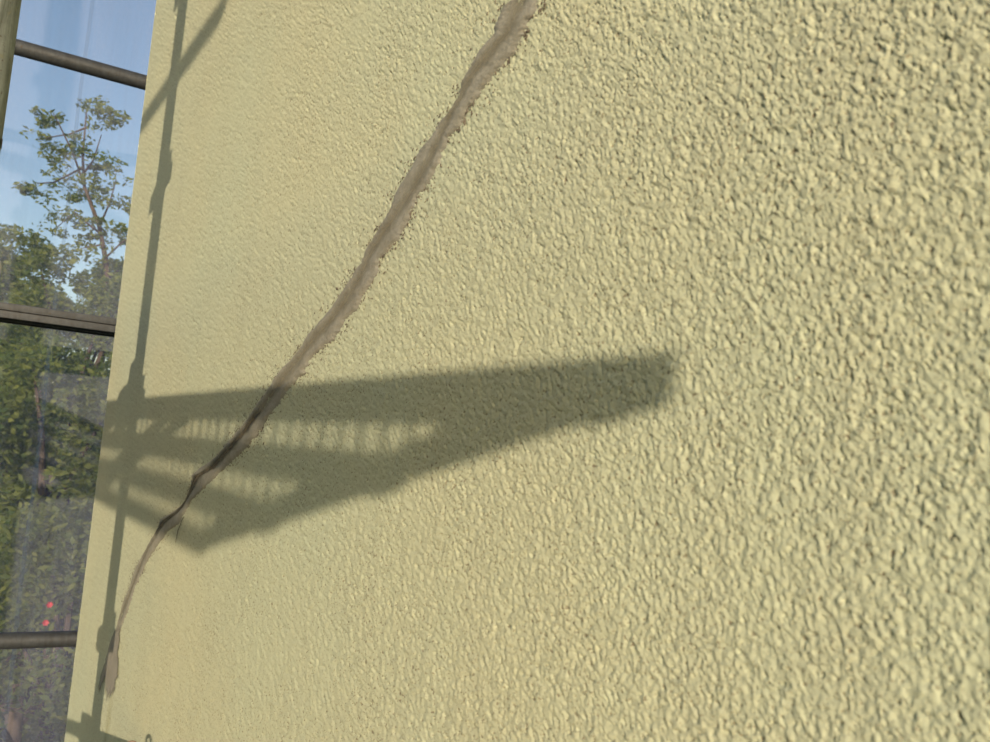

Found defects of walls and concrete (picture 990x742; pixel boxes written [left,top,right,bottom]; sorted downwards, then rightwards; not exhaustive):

crack [99,0,551,696]